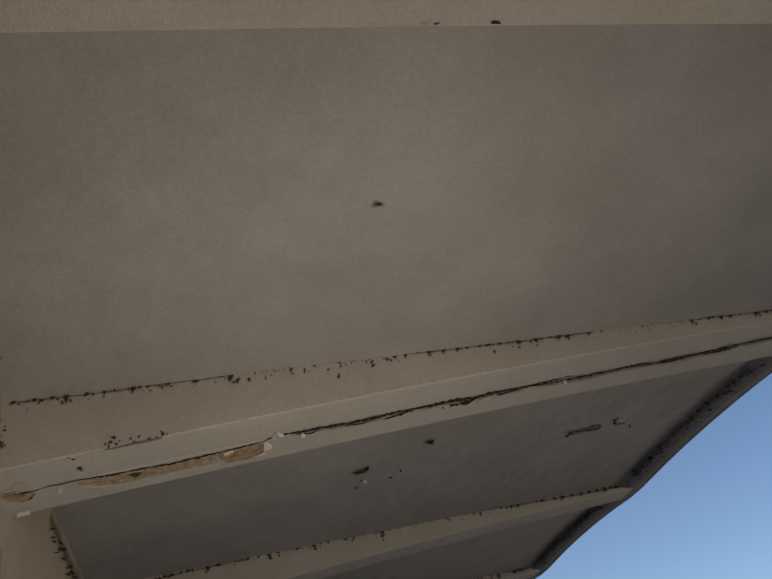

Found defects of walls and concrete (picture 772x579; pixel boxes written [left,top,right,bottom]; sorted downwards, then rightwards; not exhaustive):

crack [0,337,772,498]
spalling [77,442,272,488]
spalling [0,482,36,517]